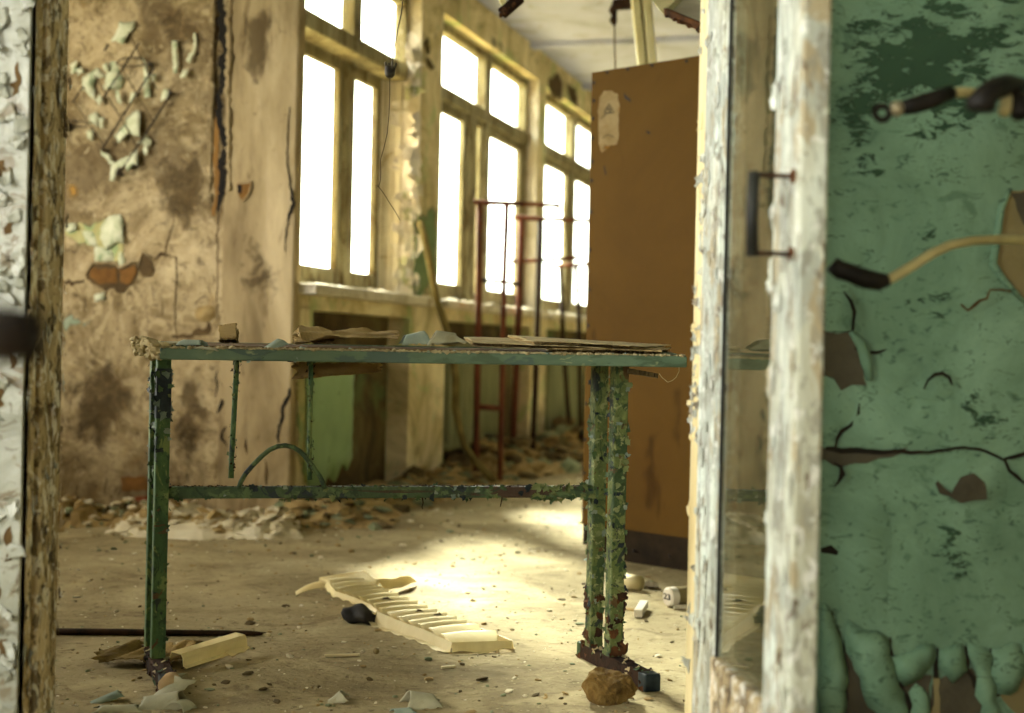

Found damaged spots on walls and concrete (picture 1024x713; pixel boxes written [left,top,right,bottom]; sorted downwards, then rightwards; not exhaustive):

peeling [53,42,169,181]
leakage [156,158,204,225]
peeling [390,31,435,295]
leakage [829,0,1024,177]
peeling [0,237,39,310]
peeling [53,212,155,302]
peeling [687,81,720,468]
spalling [823,283,886,390]
leakage [65,364,131,448]
crack [820,392,1024,490]
peeling [0,496,34,562]
peeling [818,602,1024,713]